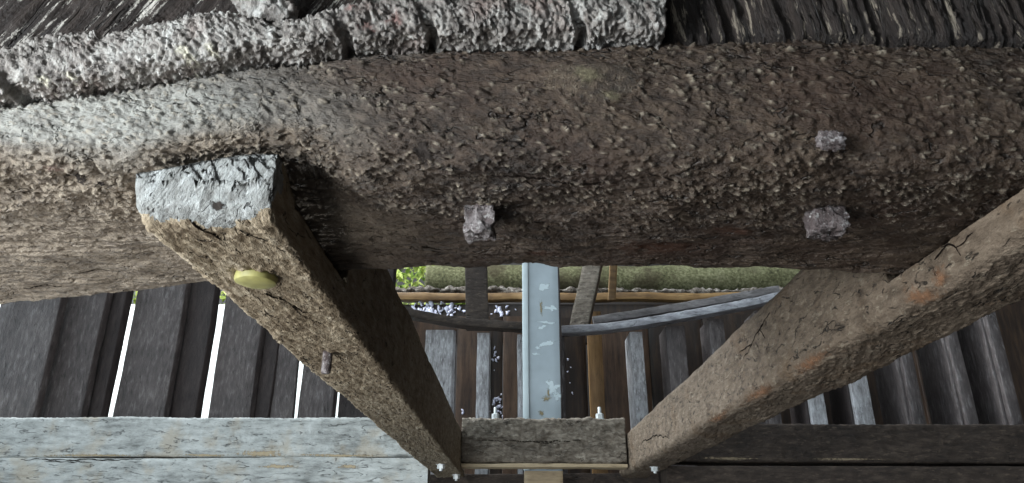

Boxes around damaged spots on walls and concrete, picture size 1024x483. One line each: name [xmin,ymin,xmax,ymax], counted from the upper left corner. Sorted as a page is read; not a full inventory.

crack [934,233,972,260]
crack [741,312,770,356]